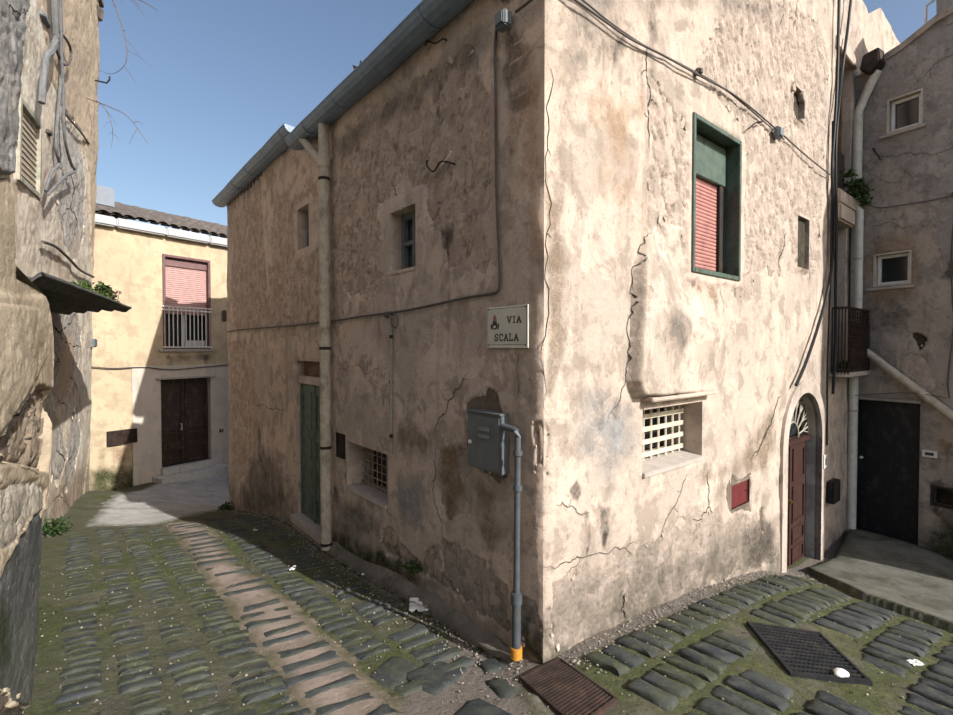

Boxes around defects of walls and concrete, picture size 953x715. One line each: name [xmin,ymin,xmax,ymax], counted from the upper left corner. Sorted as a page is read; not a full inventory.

crack [642,46,656,137]
peeling [232,43,498,341]
crack [516,71,554,413]
crack [0,313,79,502]
spalling [0,312,82,549]
crack [432,375,468,532]
peeling [440,430,507,520]
spalling [466,387,502,415]
peeling [380,472,779,660]
crack [546,541,638,573]
crack [662,476,712,537]
peeling [897,333,938,396]